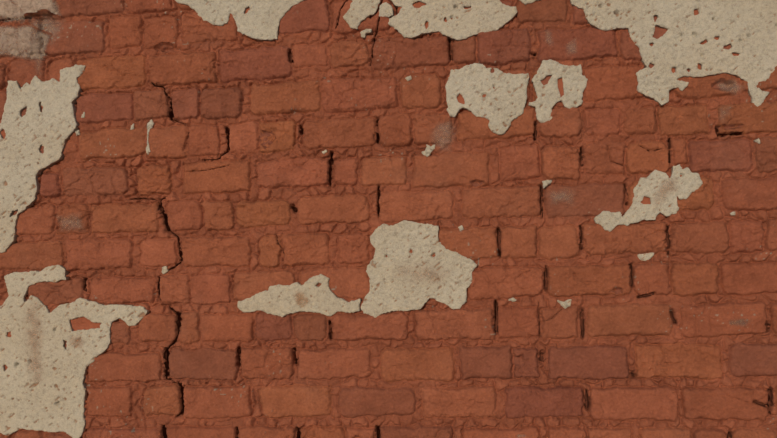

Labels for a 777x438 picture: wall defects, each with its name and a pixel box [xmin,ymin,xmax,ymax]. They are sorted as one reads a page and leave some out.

flaking render [175,0,305,42]
crack [369,0,397,66]
flaking render [343,0,539,41]
flaking render [570,0,777,107]
flaking render [445,59,588,135]
flaking render [0,64,86,253]
flaking render [594,164,703,232]
flaking render [237,220,477,318]
flaking render [0,265,150,438]